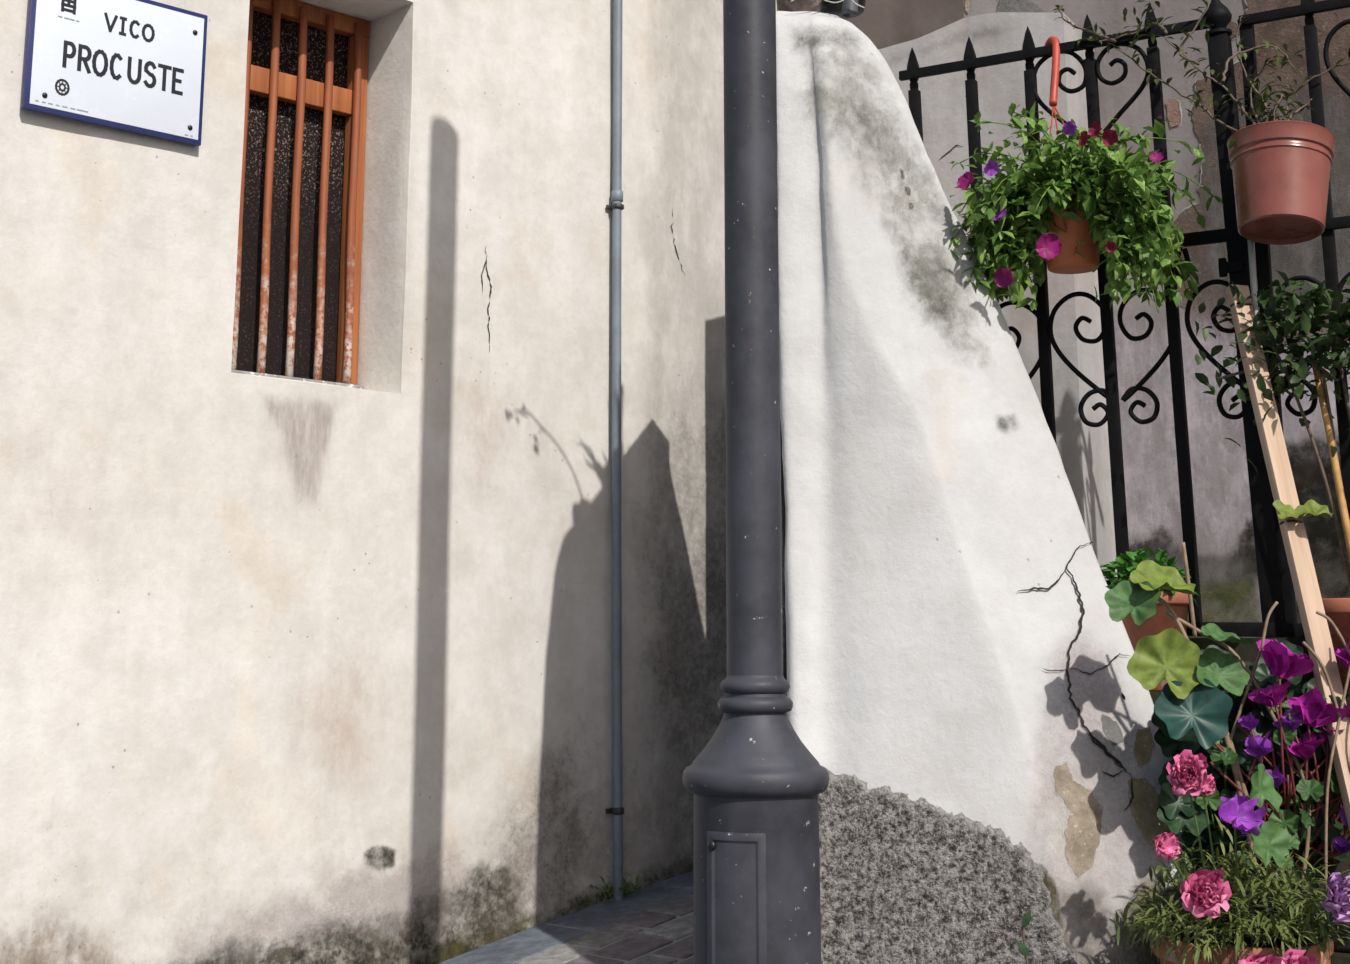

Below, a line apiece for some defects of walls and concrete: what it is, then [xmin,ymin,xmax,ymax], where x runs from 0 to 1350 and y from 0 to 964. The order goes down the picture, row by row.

leakage [812,54,941,220]
flaking render [1226,0,1350,268]
flaking render [1165,78,1236,345]
crack [481,247,492,352]
leakage [910,246,968,323]
flaking render [1276,300,1329,344]
crack [1018,541,1136,811]
flaking render [1051,759,1103,880]
flaking render [1099,714,1176,852]
leakage [194,847,537,964]